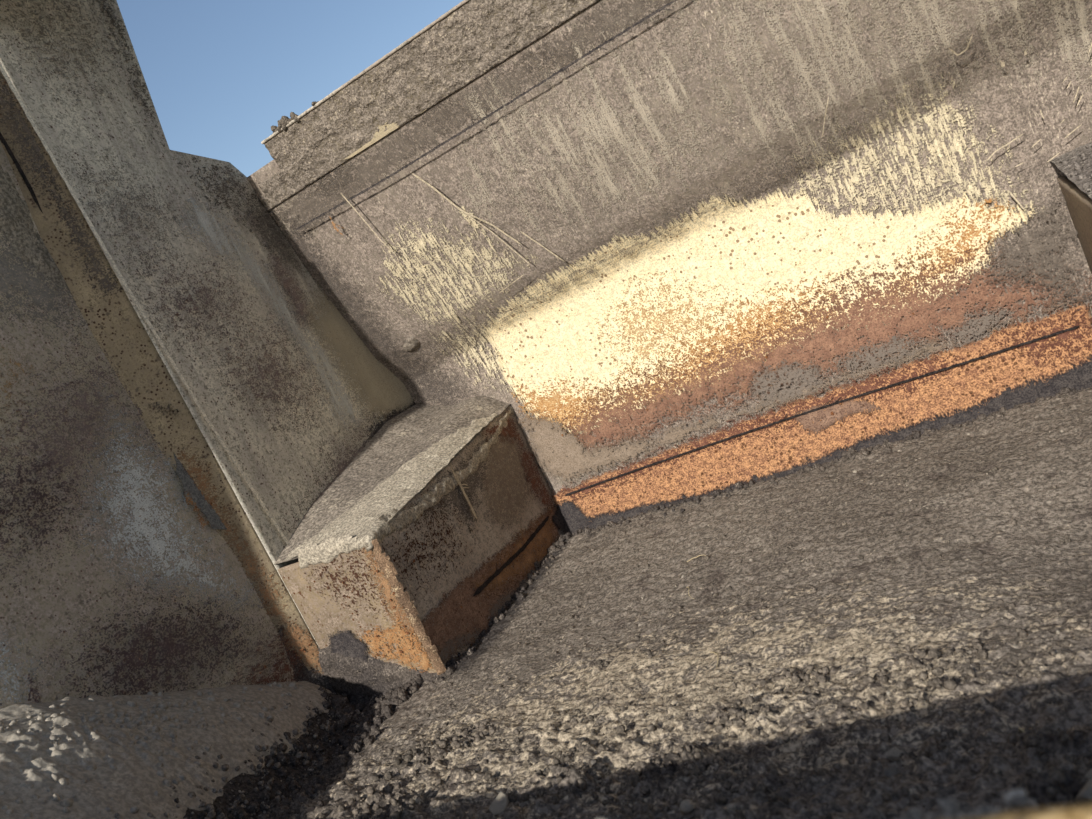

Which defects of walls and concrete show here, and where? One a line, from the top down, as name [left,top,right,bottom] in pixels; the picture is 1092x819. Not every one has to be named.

rust [0,330,322,699]
rust [304,196,1092,673]
crack [473,326,1079,596]